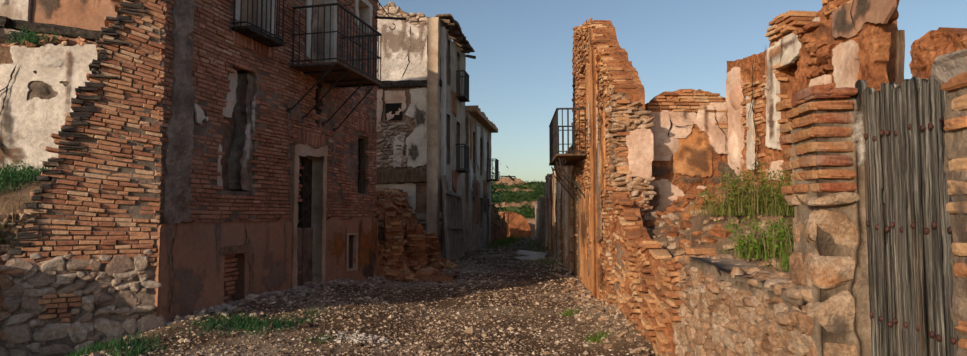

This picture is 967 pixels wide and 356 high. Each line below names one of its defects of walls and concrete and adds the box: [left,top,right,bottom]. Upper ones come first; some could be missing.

peeling [0,47,13,65]
crack [0,64,17,115]
spalling [28,71,69,100]
peeling [384,90,407,121]
peeling [392,135,405,168]
flaking render [647,102,728,213]